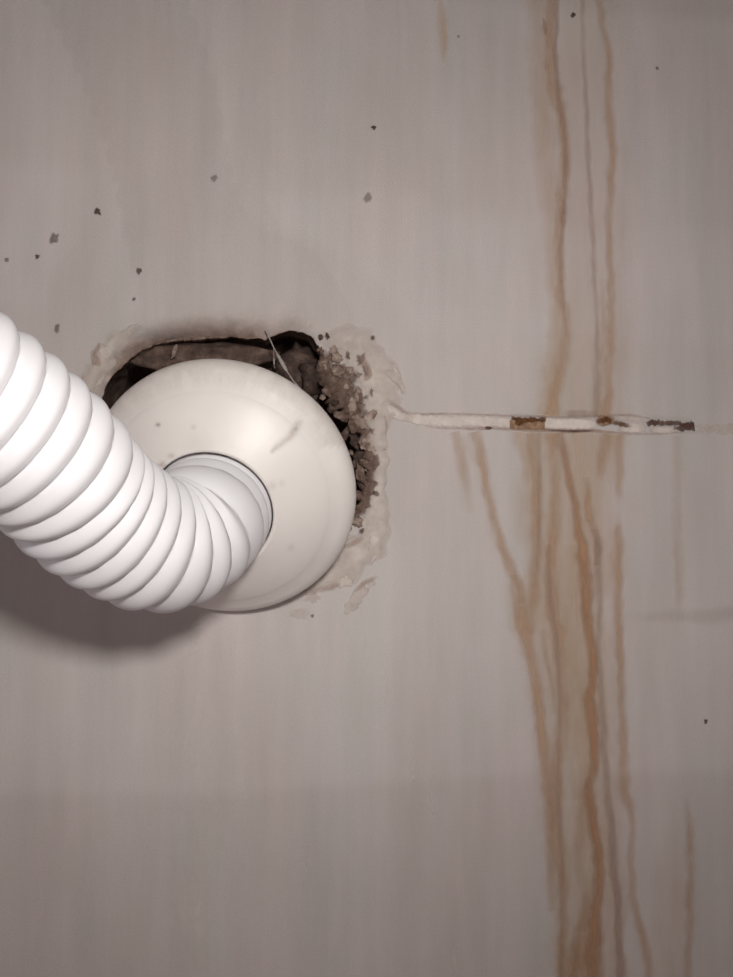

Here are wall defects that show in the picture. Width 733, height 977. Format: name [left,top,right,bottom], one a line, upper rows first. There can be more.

spalling [83,334,124,391]
spalling [129,332,407,613]
crack [395,412,695,433]
rust [566,465,622,977]